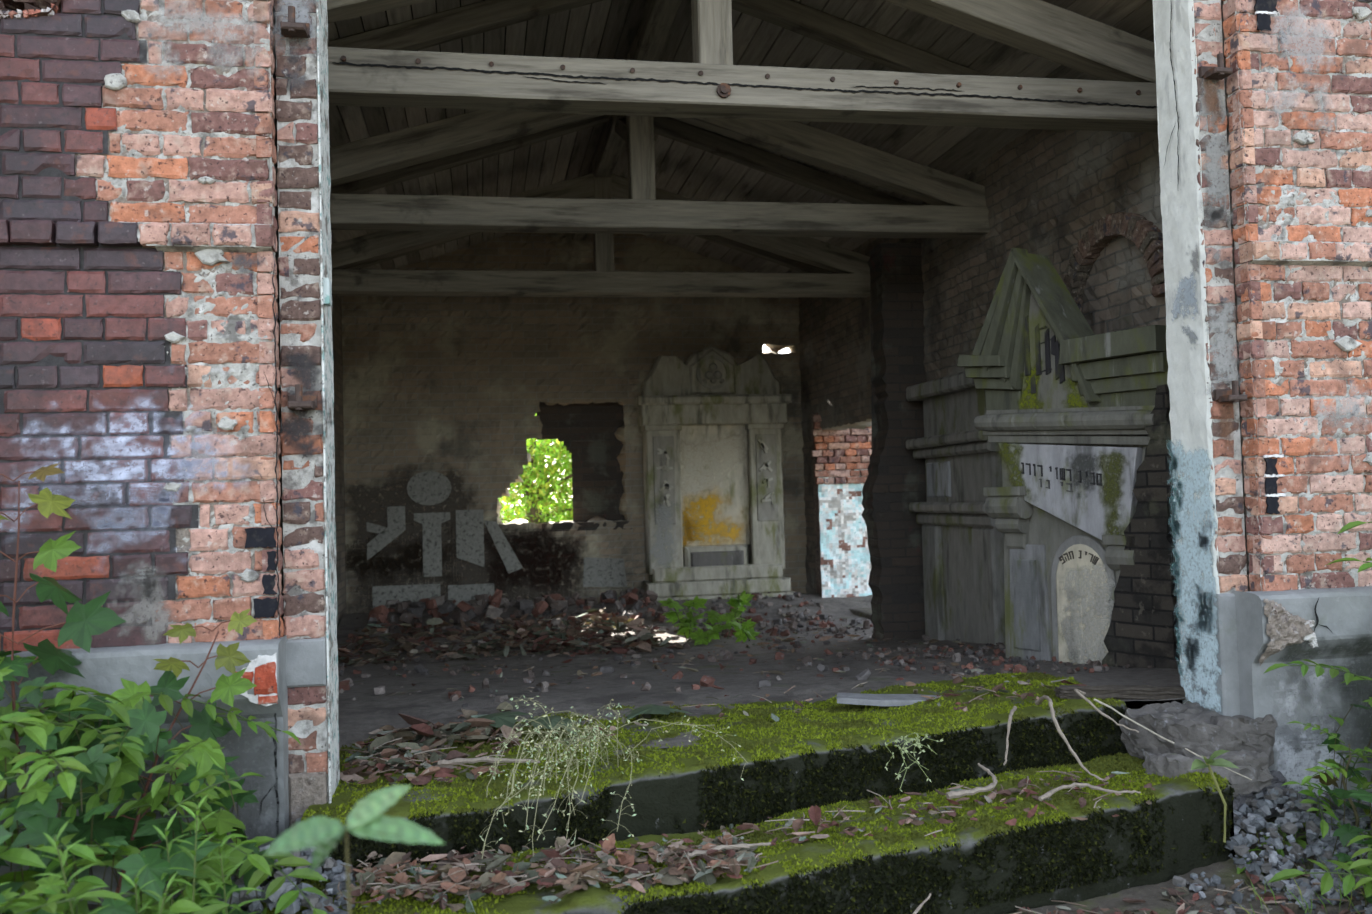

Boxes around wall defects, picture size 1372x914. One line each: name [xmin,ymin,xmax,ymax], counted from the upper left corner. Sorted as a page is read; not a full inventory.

spalling [0,0,61,19]
peeling [1227,0,1372,666]